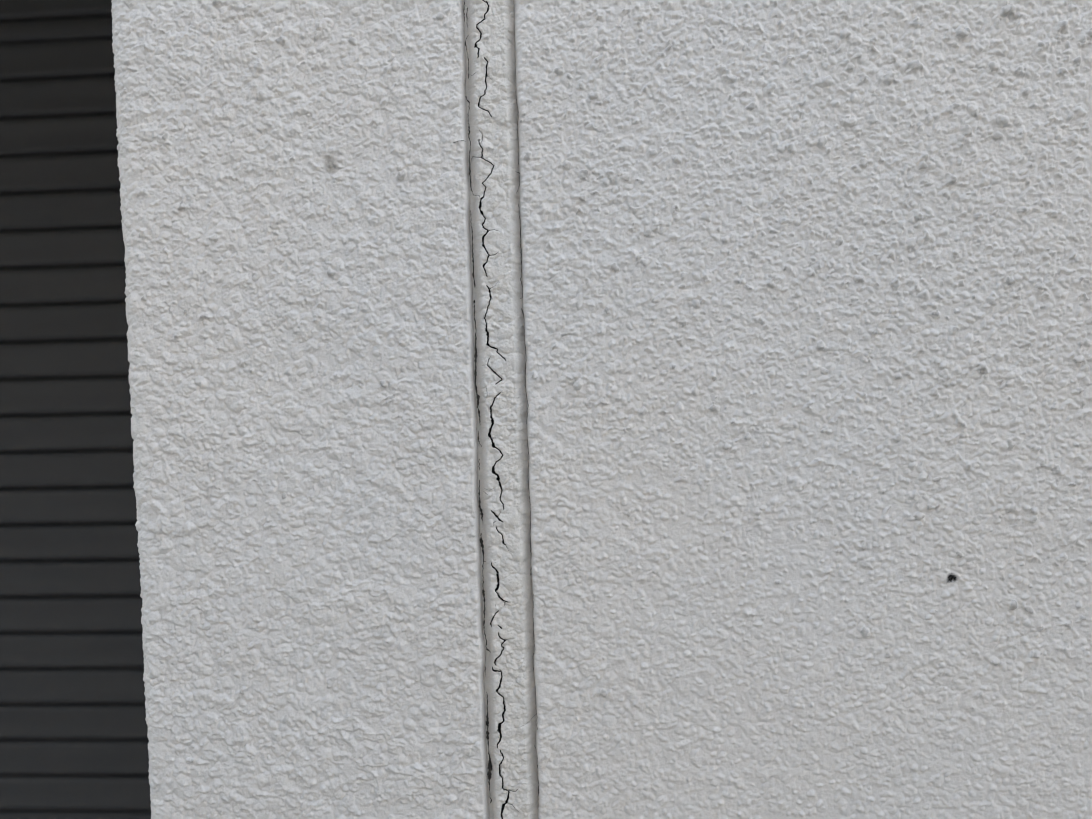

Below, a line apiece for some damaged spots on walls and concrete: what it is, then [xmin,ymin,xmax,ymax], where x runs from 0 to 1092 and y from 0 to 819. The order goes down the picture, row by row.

crack [454,0,539,819]